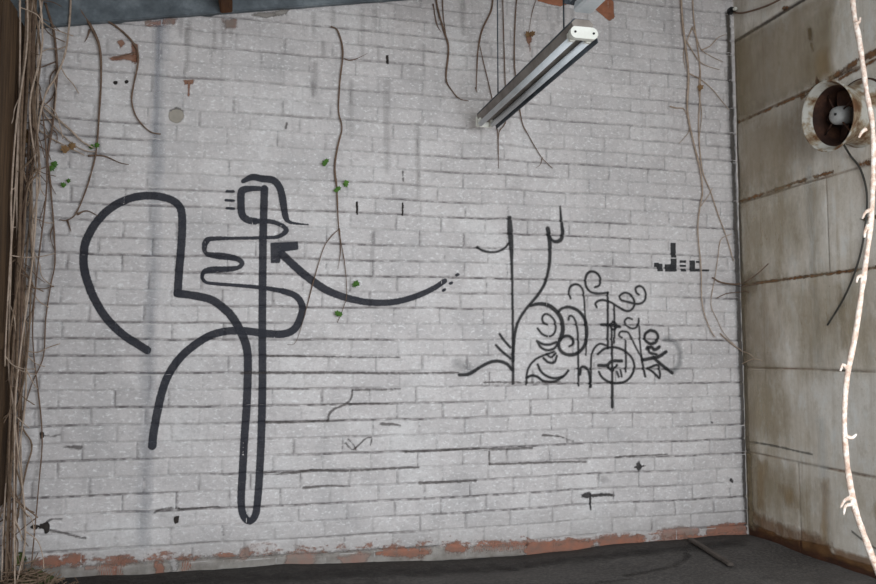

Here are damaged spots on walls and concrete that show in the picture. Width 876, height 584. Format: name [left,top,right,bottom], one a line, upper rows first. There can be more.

peeling [596,0,615,21]
peeling [110,40,138,63]
rust [738,48,876,123]
rust [740,171,834,202]
rust [742,265,876,286]
peeling [23,519,747,578]